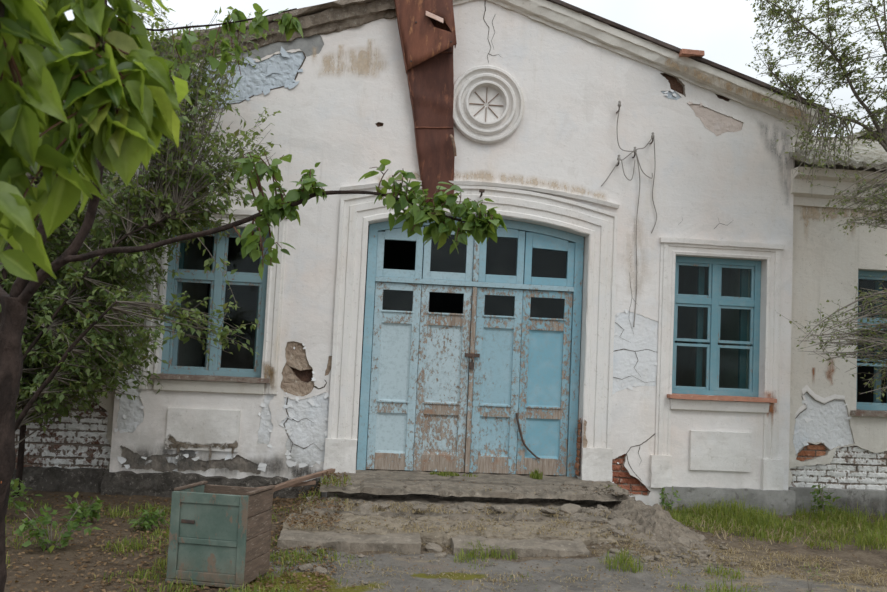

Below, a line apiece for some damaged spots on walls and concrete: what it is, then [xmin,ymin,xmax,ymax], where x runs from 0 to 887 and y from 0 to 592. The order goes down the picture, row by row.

crack [483,0,499,63]
flaking render [191,34,324,108]
flaking render [660,73,744,136]
crack [613,272,655,383]
flaking render [15,368,267,474]
peeling [257,341,332,468]
crack [284,397,312,453]
flaking render [575,418,588,476]
flaking render [612,454,651,496]
flaking render [789,443,887,490]